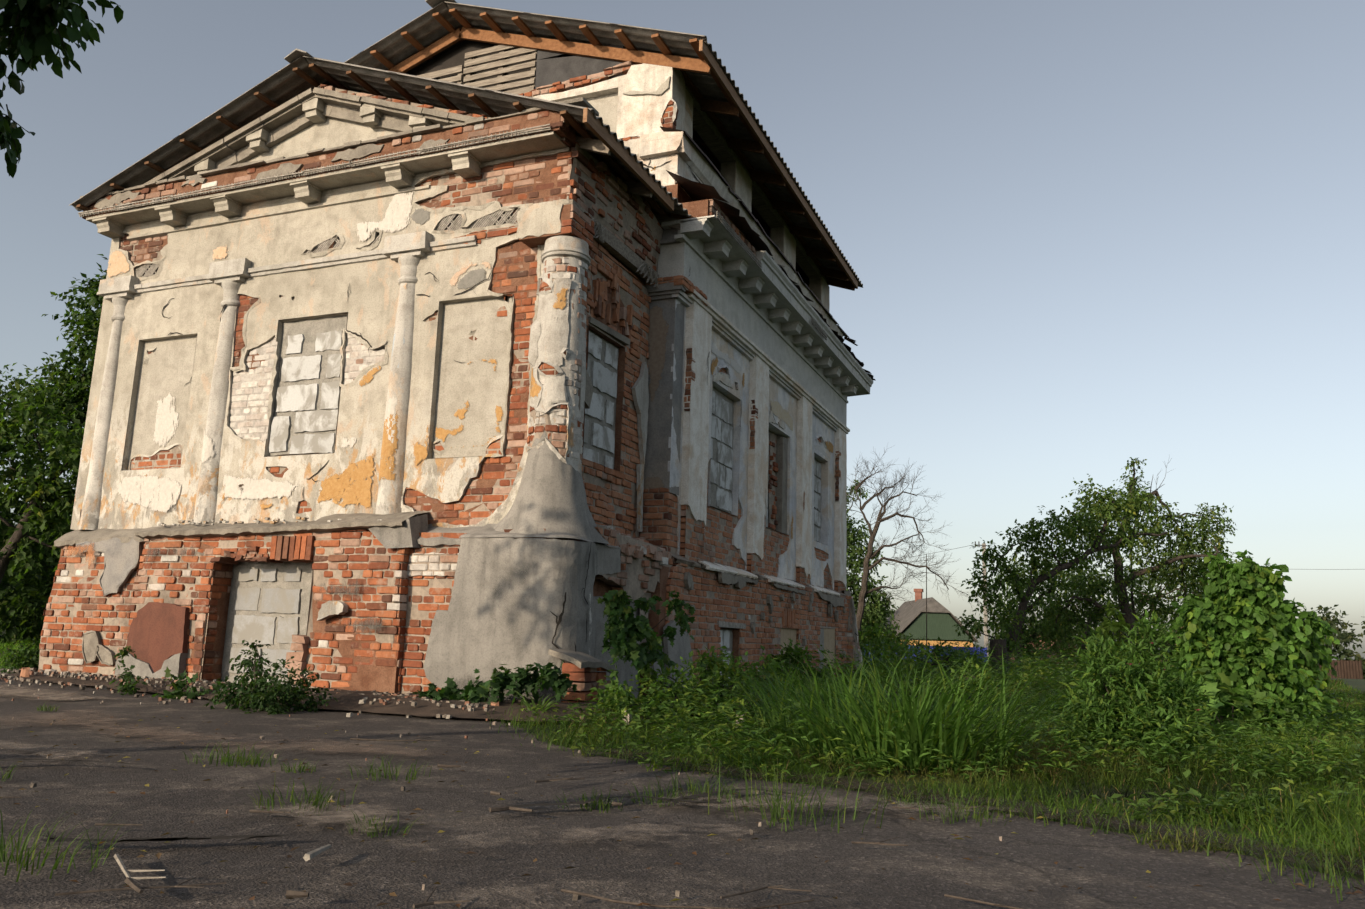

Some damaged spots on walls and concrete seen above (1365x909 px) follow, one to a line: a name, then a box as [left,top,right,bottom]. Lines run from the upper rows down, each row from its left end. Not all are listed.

flaking render [225,291,281,443]
flaking render [401,151,573,527]
spalling [684,348,695,411]
spalling [815,434,841,502]
spalling [595,400,789,618]
flaking render [407,552,459,577]
flaking render [796,548,845,593]